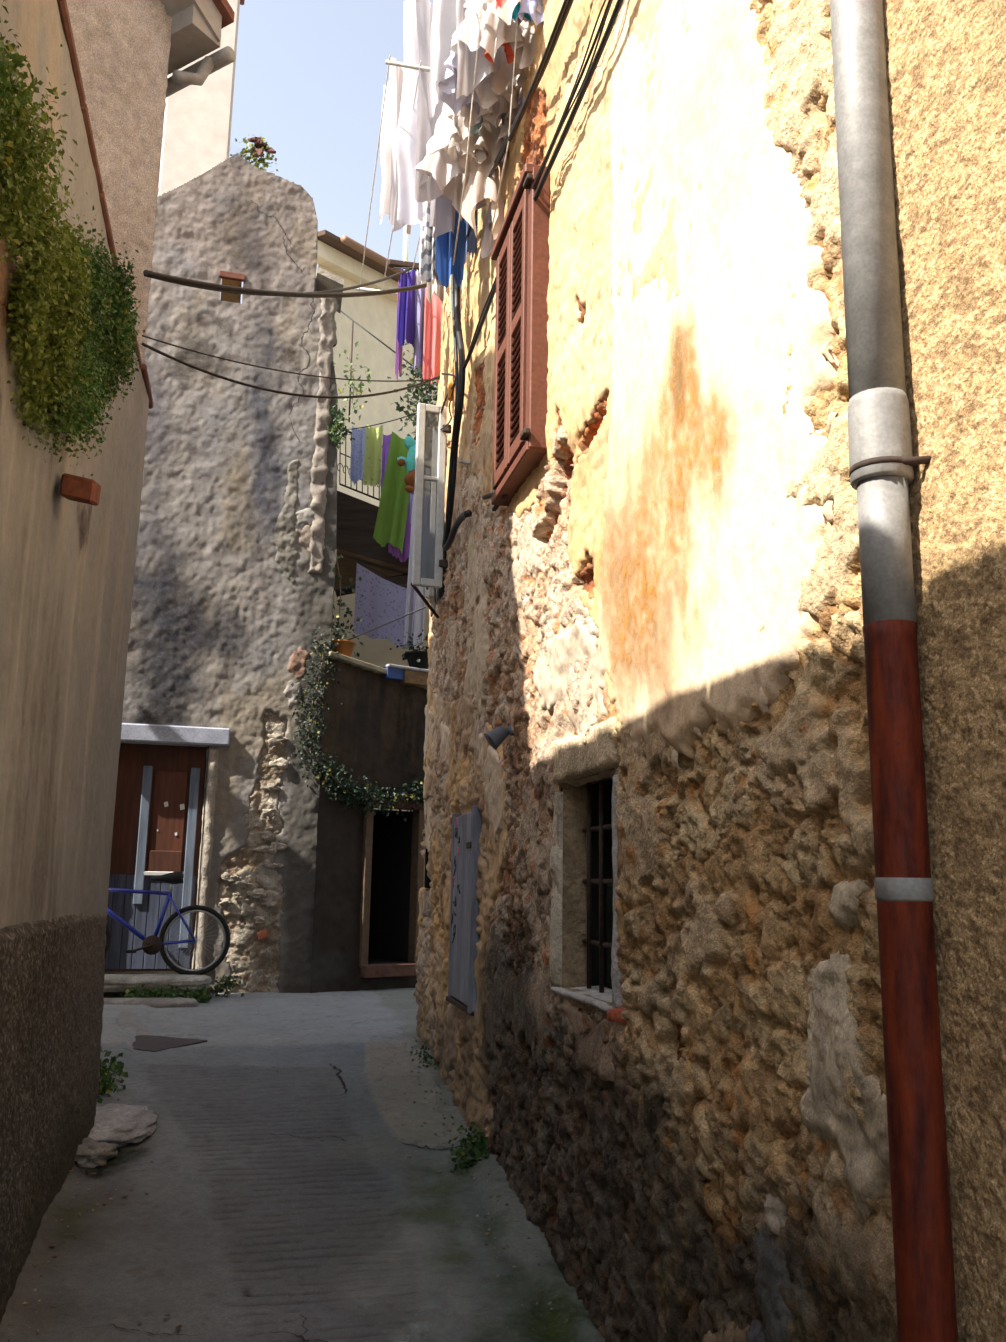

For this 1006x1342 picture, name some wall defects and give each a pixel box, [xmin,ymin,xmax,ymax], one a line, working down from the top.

crack [250,199,316,441]
water stain [130,556,242,726]
water stain [600,326,727,673]
spalling [429,0,898,1342]